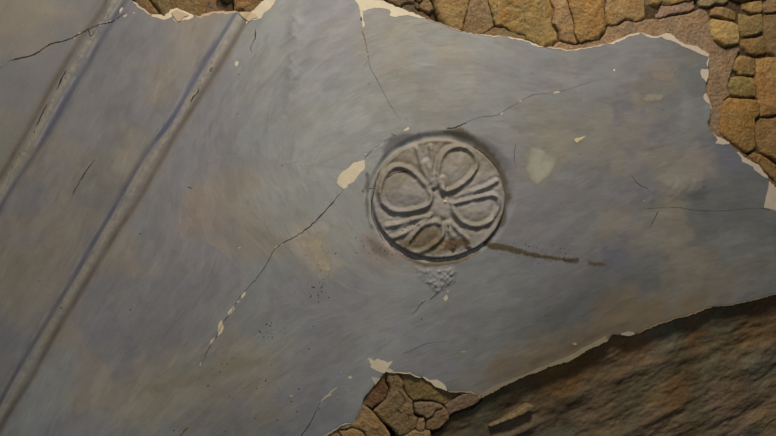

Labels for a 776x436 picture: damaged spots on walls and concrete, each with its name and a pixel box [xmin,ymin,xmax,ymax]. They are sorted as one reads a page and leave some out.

crack [3,7,135,67]
spalling [132,0,275,24]
spalling [355,0,776,211]
peeling [337,160,365,189]
crack [200,189,344,366]
spalling [621,308,708,336]
crack [301,371,349,436]
spalling [324,336,608,436]